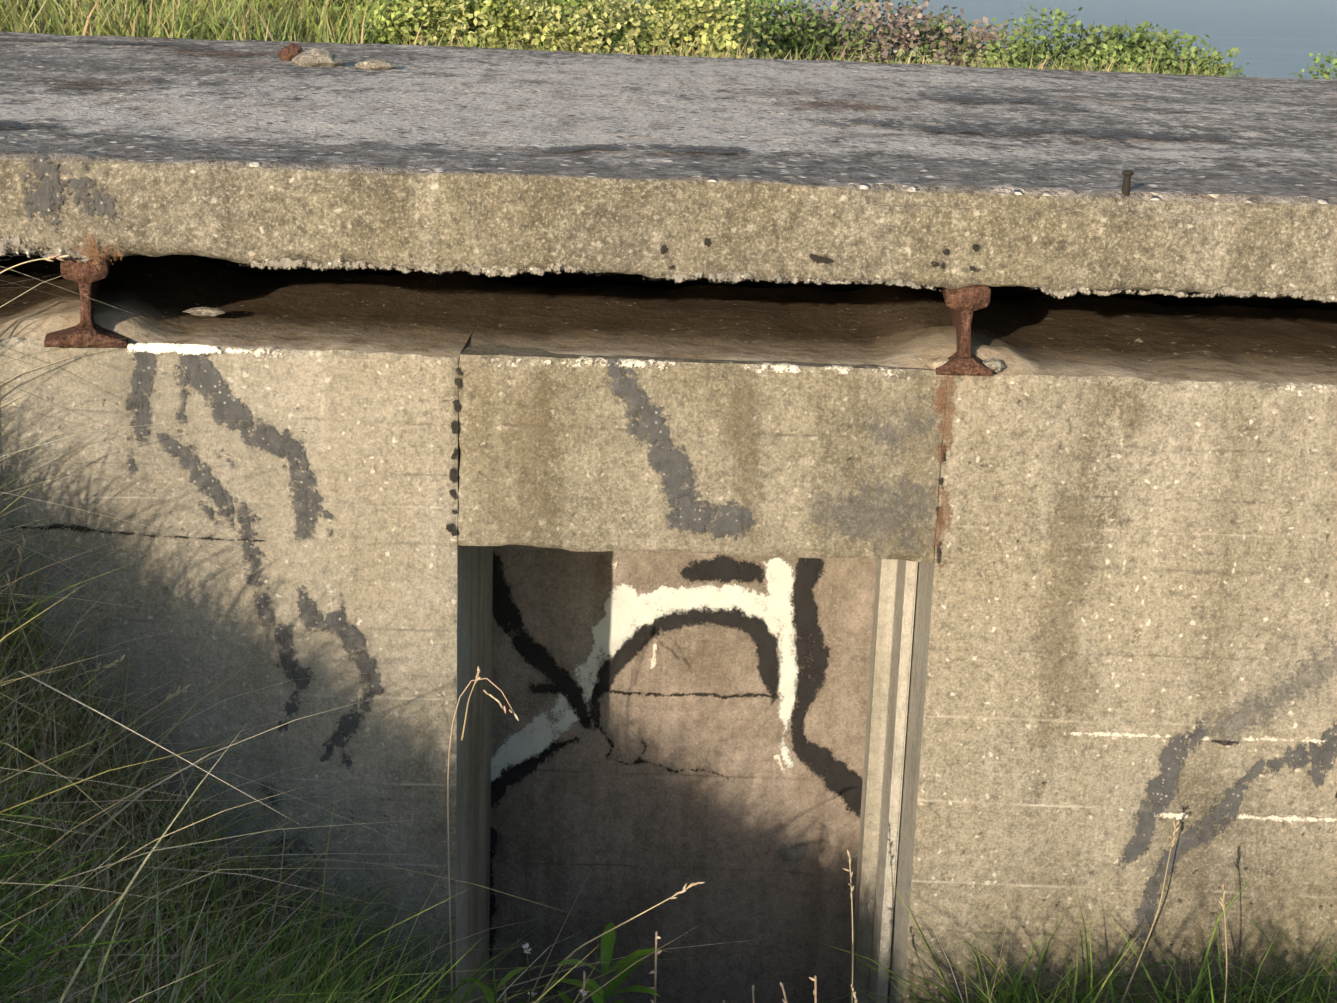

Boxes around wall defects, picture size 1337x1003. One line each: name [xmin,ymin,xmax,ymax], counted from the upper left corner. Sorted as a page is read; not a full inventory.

corrosion [73,230,123,270]
corrosion [934,375,957,464]
corrosion [932,486,952,547]
crack [593,689,772,700]
crack [600,727,729,779]